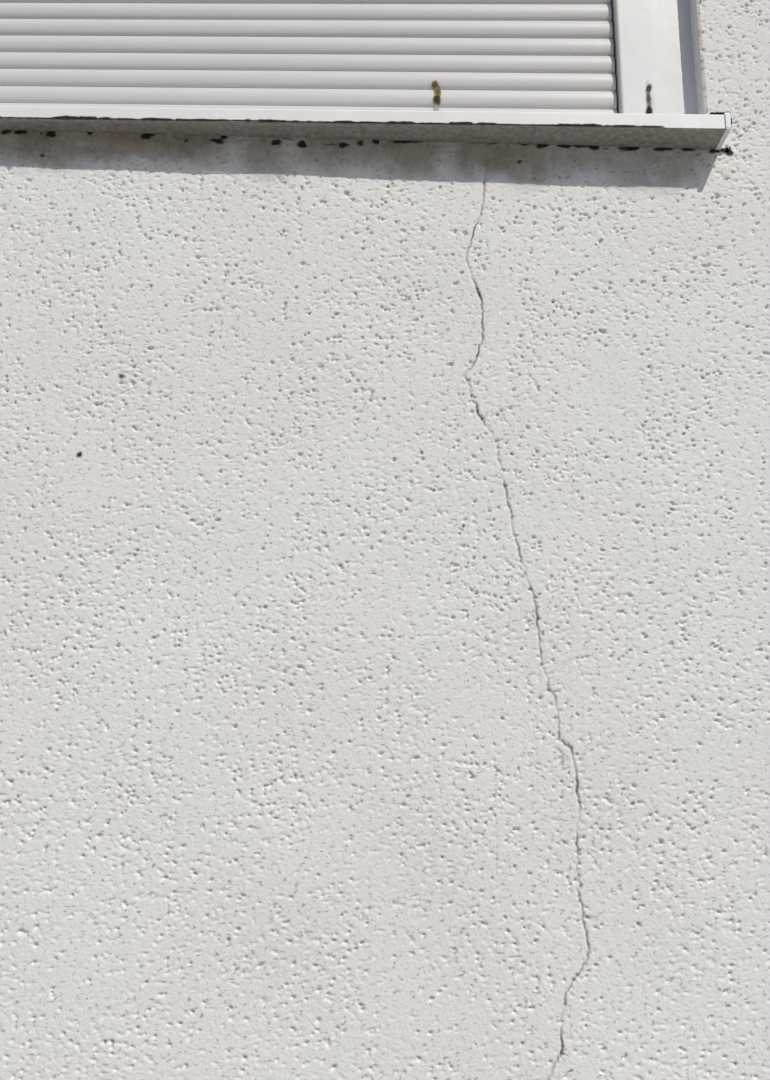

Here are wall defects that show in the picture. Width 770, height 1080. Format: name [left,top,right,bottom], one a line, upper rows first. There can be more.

leakage [0,115,663,154]
leakage [516,144,599,167]
crack [473,280,484,361]